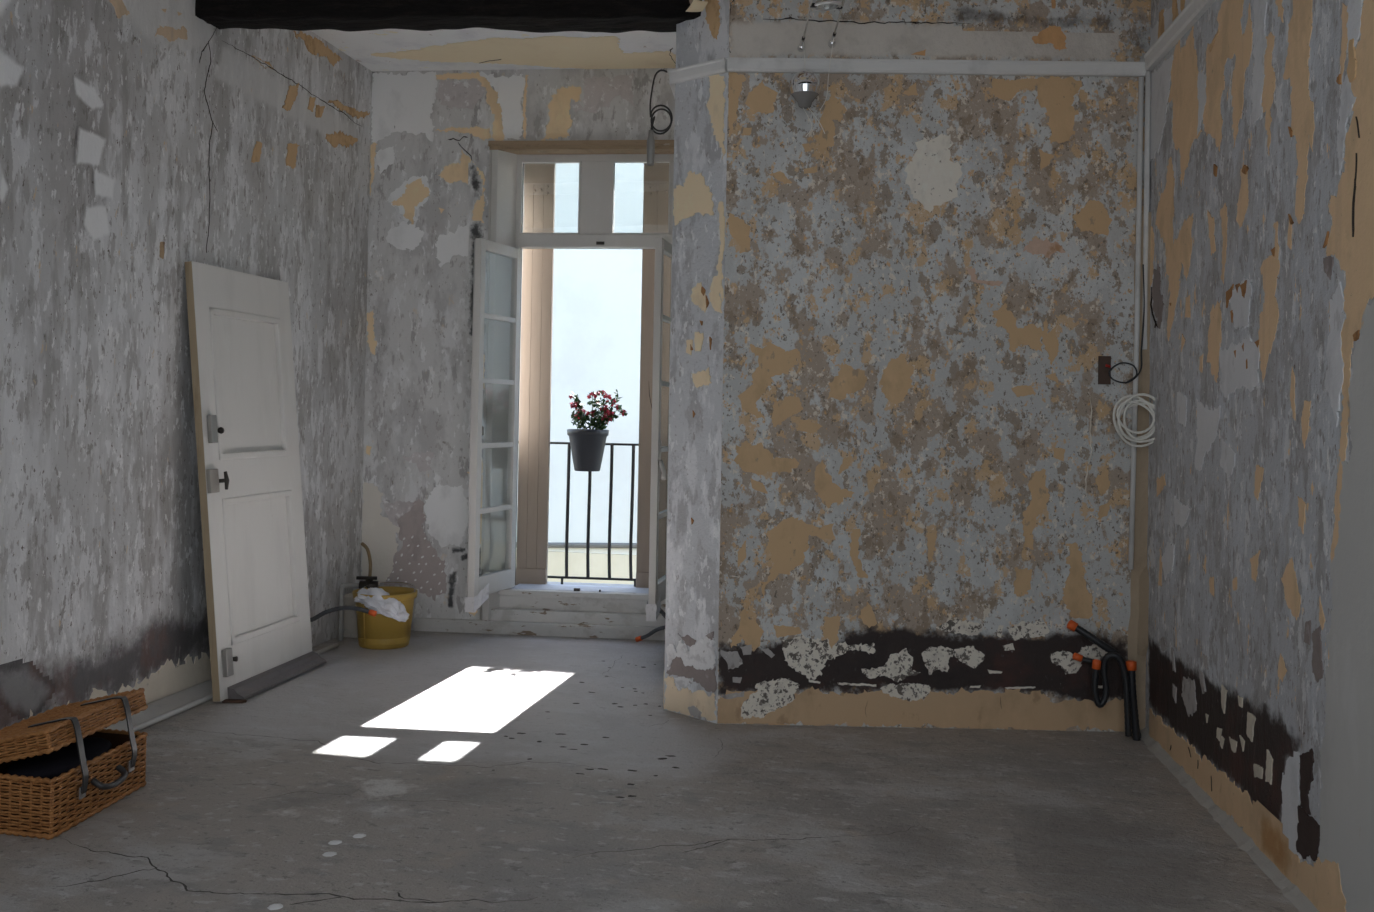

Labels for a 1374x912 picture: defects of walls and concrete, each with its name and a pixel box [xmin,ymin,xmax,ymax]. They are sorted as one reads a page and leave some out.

crack [199,29,361,253]
peeling [282,31,676,267]
peeling [673,171,751,313]
flaking render [706,0,1119,170]
flaking render [904,134,963,212]
peeling [738,342,823,434]
flaking render [1149,0,1374,912]
spalling [361,459,483,601]
flaking render [605,441,1125,731]
damp [0,589,210,730]
flaking render [90,652,212,704]
crack [56,840,537,905]